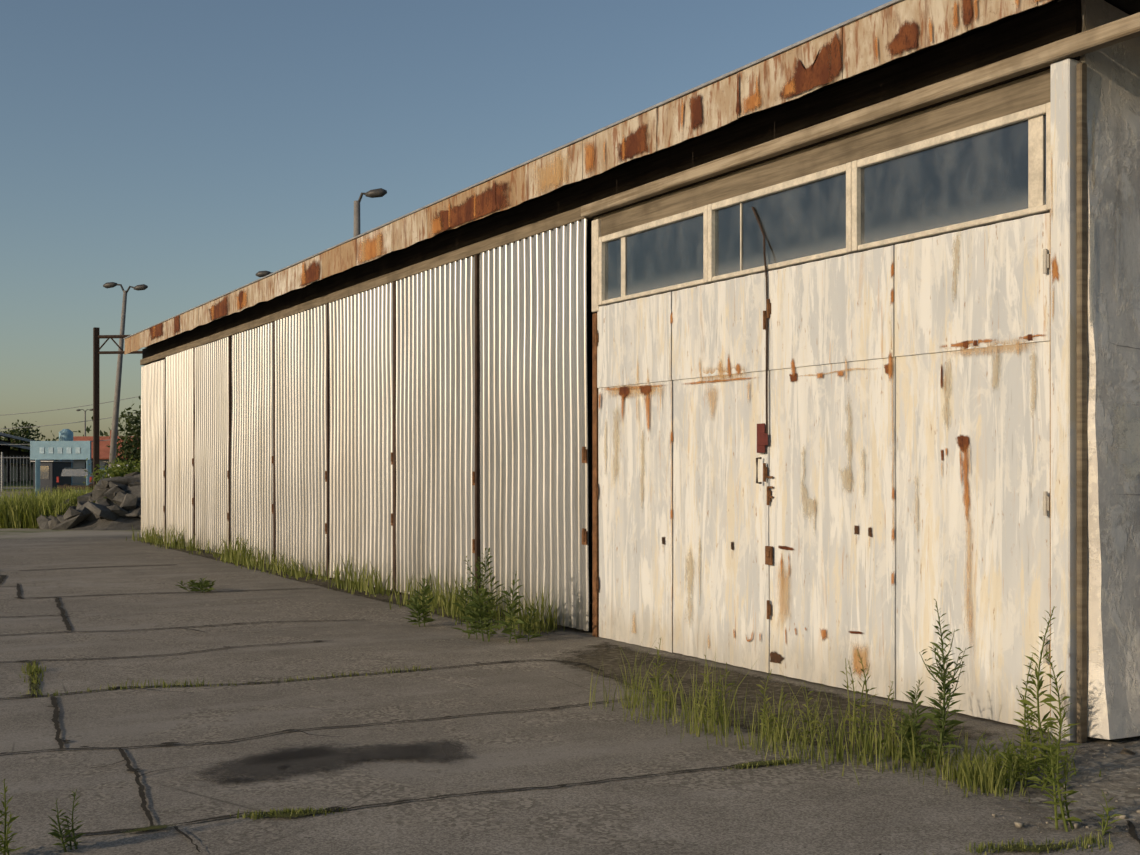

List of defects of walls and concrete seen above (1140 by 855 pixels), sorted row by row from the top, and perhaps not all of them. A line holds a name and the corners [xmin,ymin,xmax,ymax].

rust [875,17,932,62]
rust [779,32,843,99]
rust [681,94,702,129]
rust [584,124,649,171]
rust [432,181,510,234]
rust [150,315,180,340]
rust [685,357,751,414]
rust [789,359,861,382]
rust [941,435,972,632]
rust [770,627,806,663]
crack [0,564,630,852]
crack [313,764,742,811]